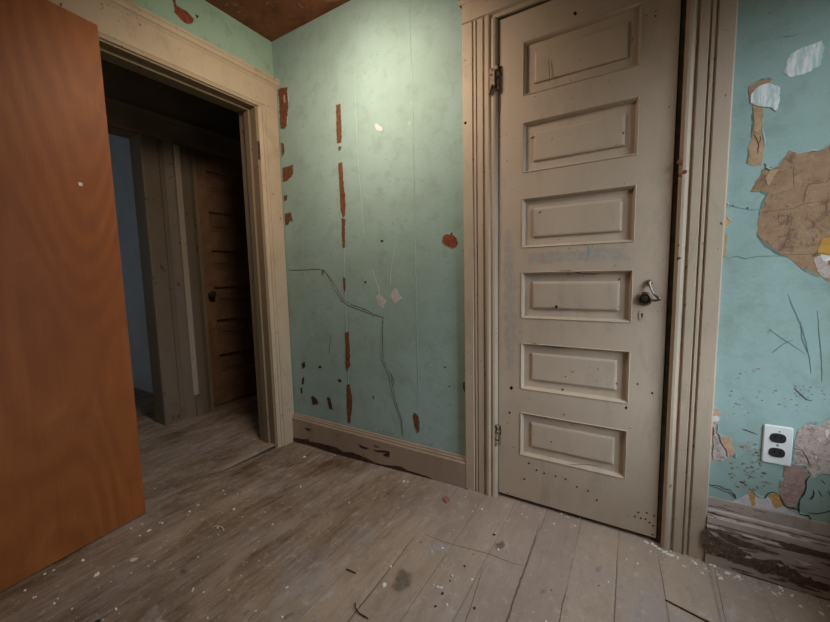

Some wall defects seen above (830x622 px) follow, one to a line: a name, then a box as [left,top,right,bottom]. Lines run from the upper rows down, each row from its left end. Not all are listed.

peeling [278,87,289,129]
peeling [282,165,293,182]
peeling [334,30,353,423]
peeling [442,232,458,249]
flaking render [751,143,830,282]
crack [306,269,403,435]
peeling [293,428,433,480]
flaking render [711,407,830,520]
peeling [702,529,830,592]